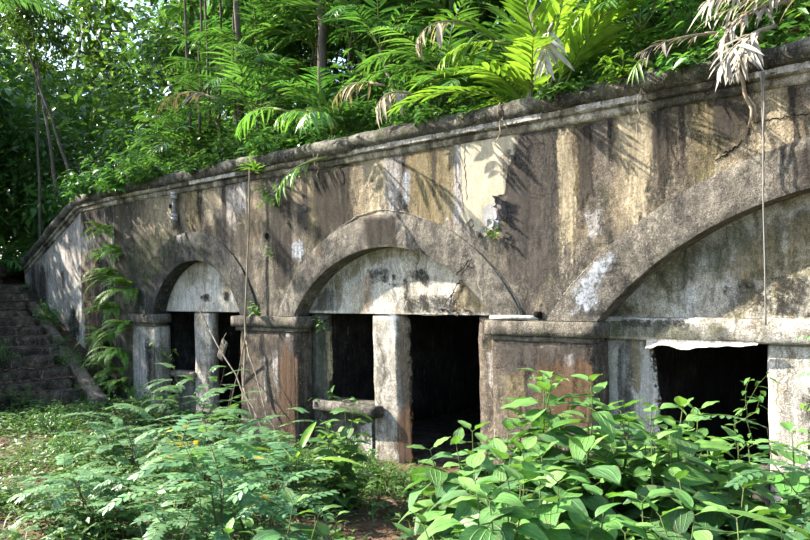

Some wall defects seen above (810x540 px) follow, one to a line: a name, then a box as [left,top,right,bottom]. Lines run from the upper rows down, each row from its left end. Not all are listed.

peeling [353,113,541,237]
water stain [469,124,603,314]
water stain [607,95,749,225]
water stain [659,209,810,317]
crack [715,112,810,161]
rust [277,343,298,439]